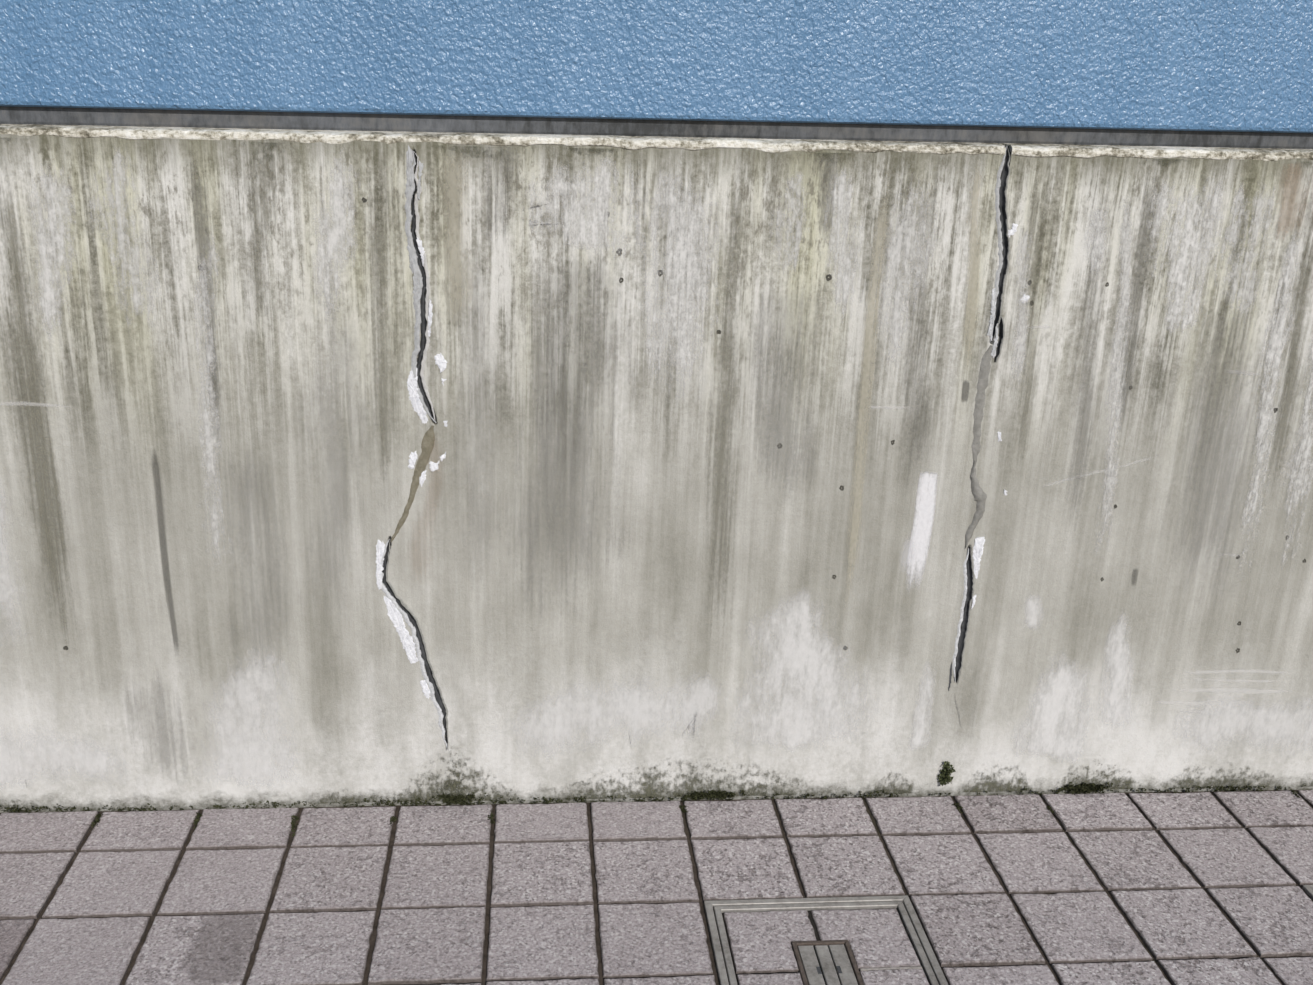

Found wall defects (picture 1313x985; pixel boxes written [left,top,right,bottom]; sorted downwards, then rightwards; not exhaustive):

damp [1,175,72,589]
crack [376,146,448,749]
damp [531,160,633,249]
damp [646,178,709,376]
damp [830,171,857,312]
damp [849,193,931,571]
crack [948,146,1030,728]
damp [1104,211,1131,522]
damp [1151,185,1273,330]
damp [1244,227,1313,521]
damp [527,679,716,748]
damp [742,594,859,748]